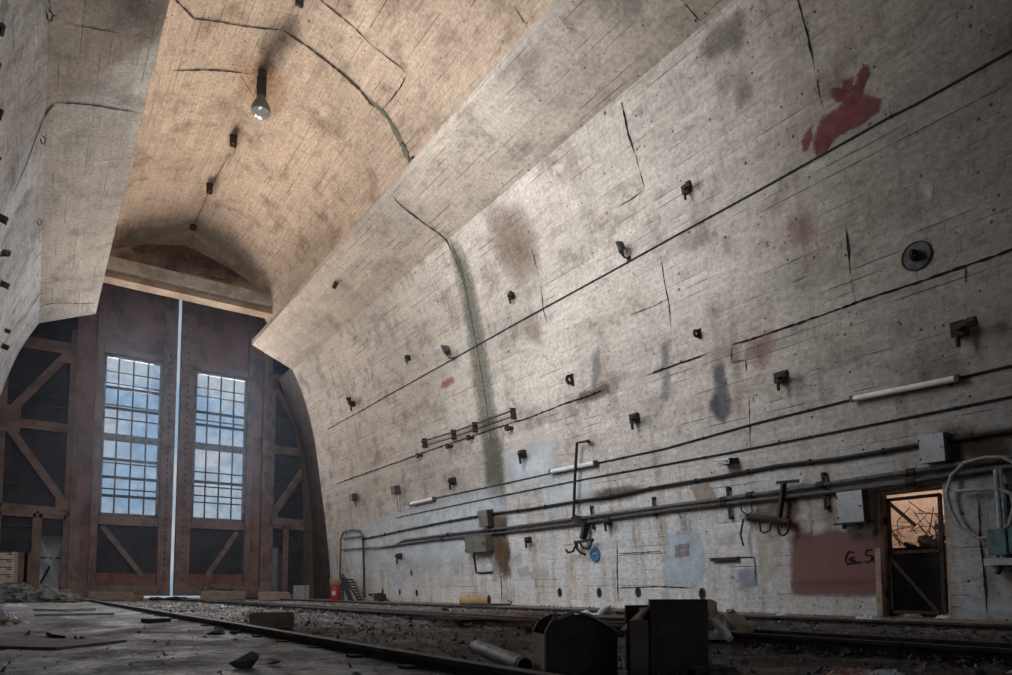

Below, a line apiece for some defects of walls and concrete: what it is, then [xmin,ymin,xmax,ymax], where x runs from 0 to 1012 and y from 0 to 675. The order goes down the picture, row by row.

crack [172,0,411,163]
crack [797,0,823,106]
crack [393,196,466,286]
crack [648,225,1012,375]
crack [337,390,602,484]
water stain [454,251,502,515]
water stain [710,366,729,422]
crack [977,491,987,612]